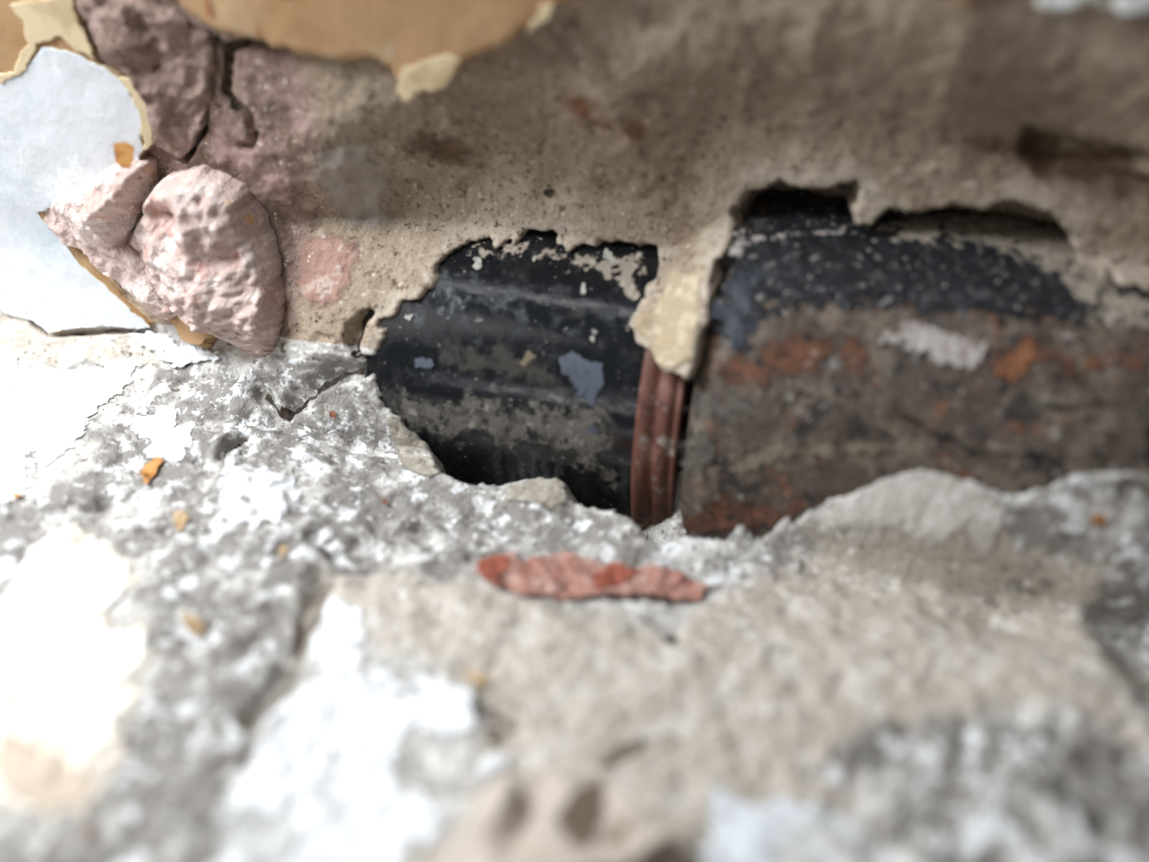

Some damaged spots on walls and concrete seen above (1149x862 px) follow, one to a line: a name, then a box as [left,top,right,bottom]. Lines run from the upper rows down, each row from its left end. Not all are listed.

crack [211,33,266,141]
spalling [0,0,1149,509]
rust [708,329,879,386]
rust [992,334,1042,384]
peeling [212,444,311,530]
rust [662,494,810,539]
rust [1092,514,1106,531]
flaking render [474,551,707,602]